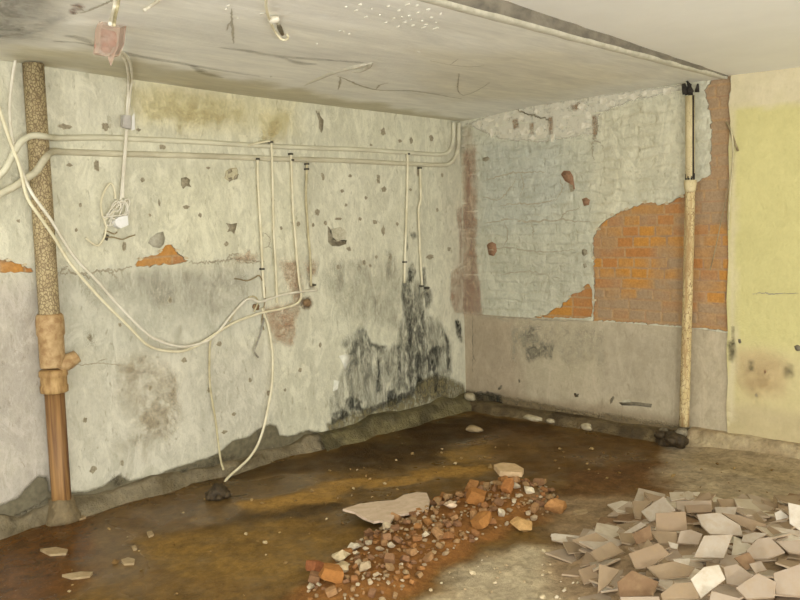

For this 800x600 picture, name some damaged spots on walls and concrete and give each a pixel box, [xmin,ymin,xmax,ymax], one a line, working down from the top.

flaking render [692,76,731,331]
flaking render [0,259,33,273]
flaking render [135,232,189,267]
flaking render [536,194,685,326]
leakage [338,268,450,420]
leakage [161,424,320,474]
leakage [0,476,51,516]
leakage [71,475,143,495]